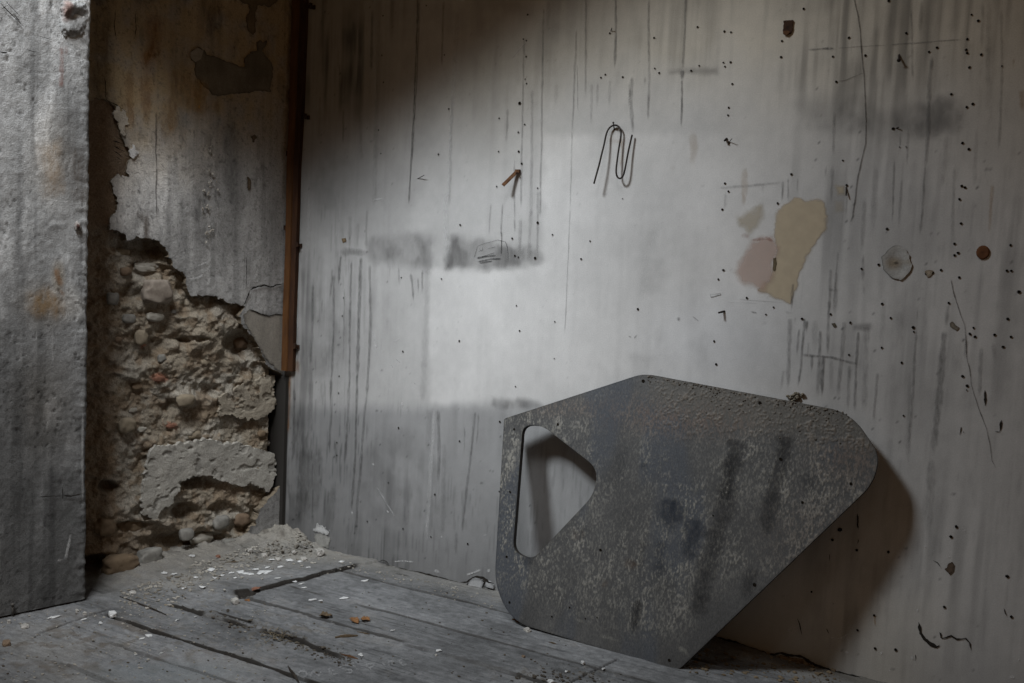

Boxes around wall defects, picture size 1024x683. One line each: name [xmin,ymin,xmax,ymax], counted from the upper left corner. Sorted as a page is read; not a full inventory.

peeling [190,0,278,96]
peeling [739,198,827,304]
spalling [74,98,284,575]